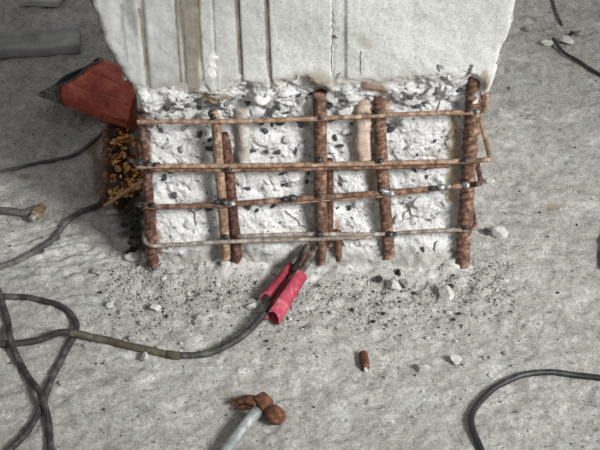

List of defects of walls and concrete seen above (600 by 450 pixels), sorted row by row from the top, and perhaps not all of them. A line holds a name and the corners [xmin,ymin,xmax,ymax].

spalling [88,0,513,271]
corrosion [362,83,390,112]
corrosion [448,116,458,202]
crack [402,199,420,221]